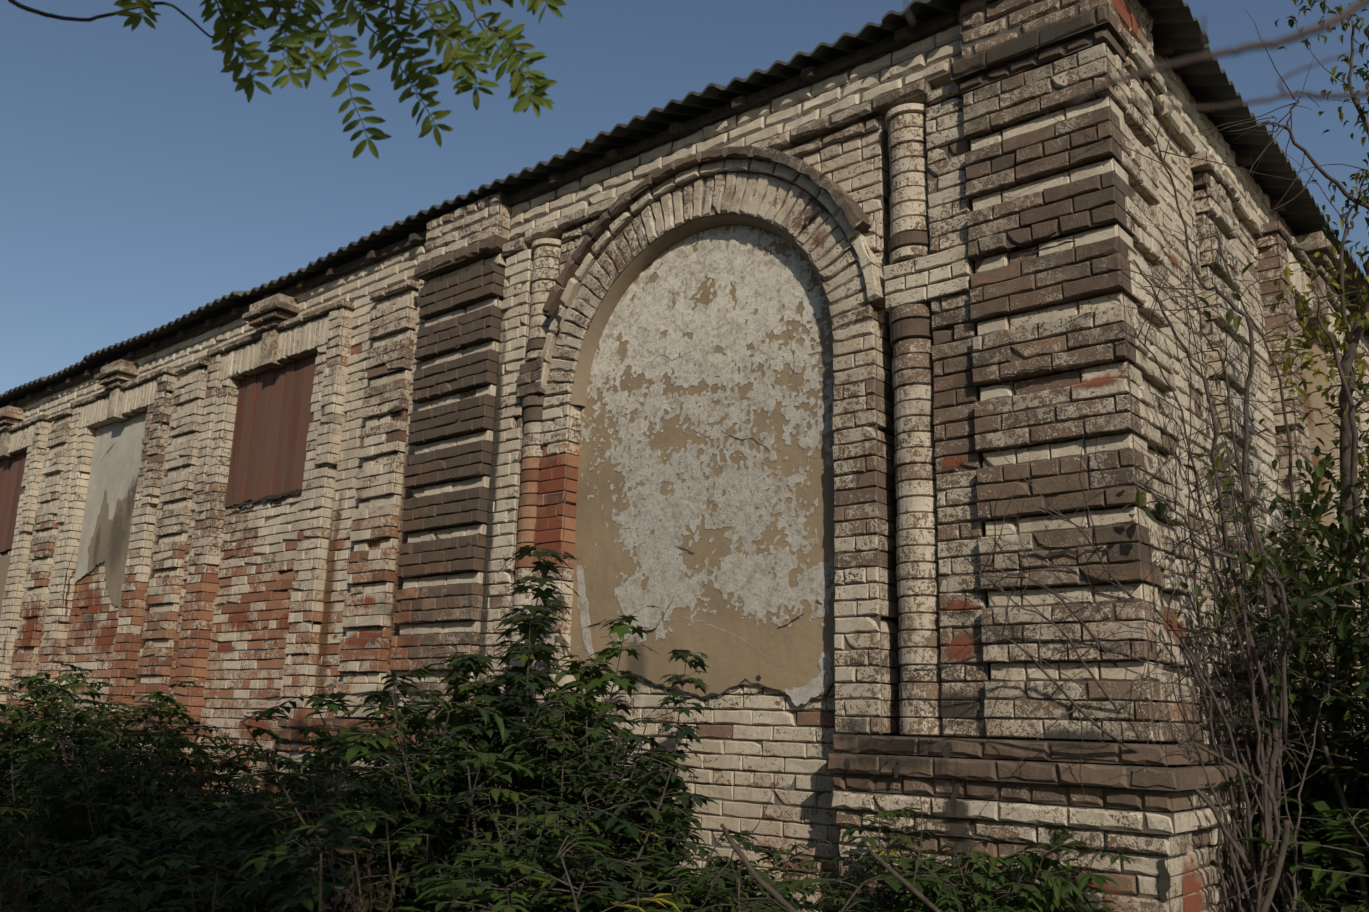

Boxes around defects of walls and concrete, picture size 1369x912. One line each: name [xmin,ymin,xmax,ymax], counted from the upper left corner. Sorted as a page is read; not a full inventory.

peeling [534,225,834,659]
flaking render [83,473,139,653]
peeling [240,717,272,742]
peeling [785,652,833,706]